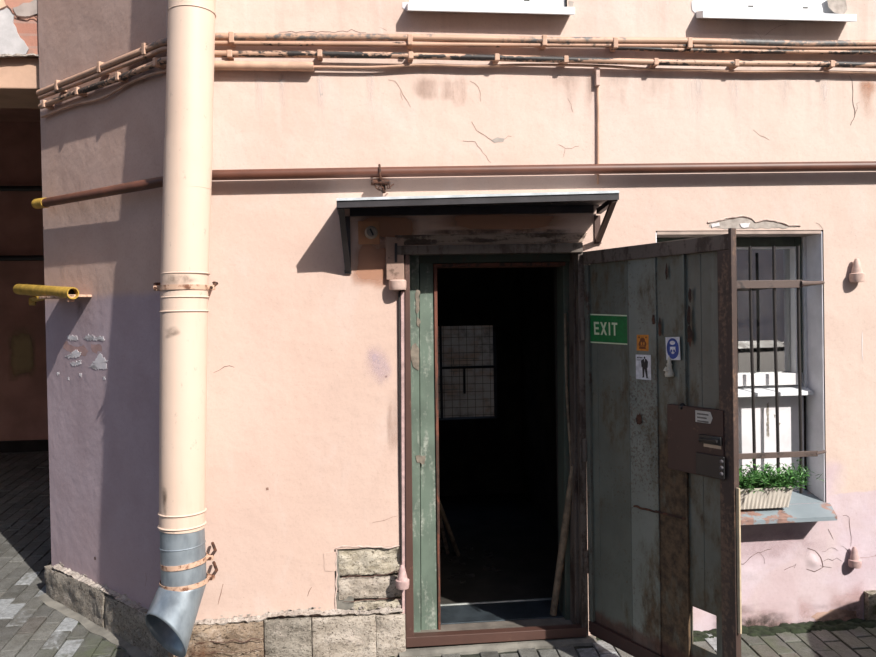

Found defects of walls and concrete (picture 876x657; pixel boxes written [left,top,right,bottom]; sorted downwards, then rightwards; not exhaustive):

flaking render [0,0,39,58]
flaking render [707,215,801,229]
peeling [57,334,108,380]